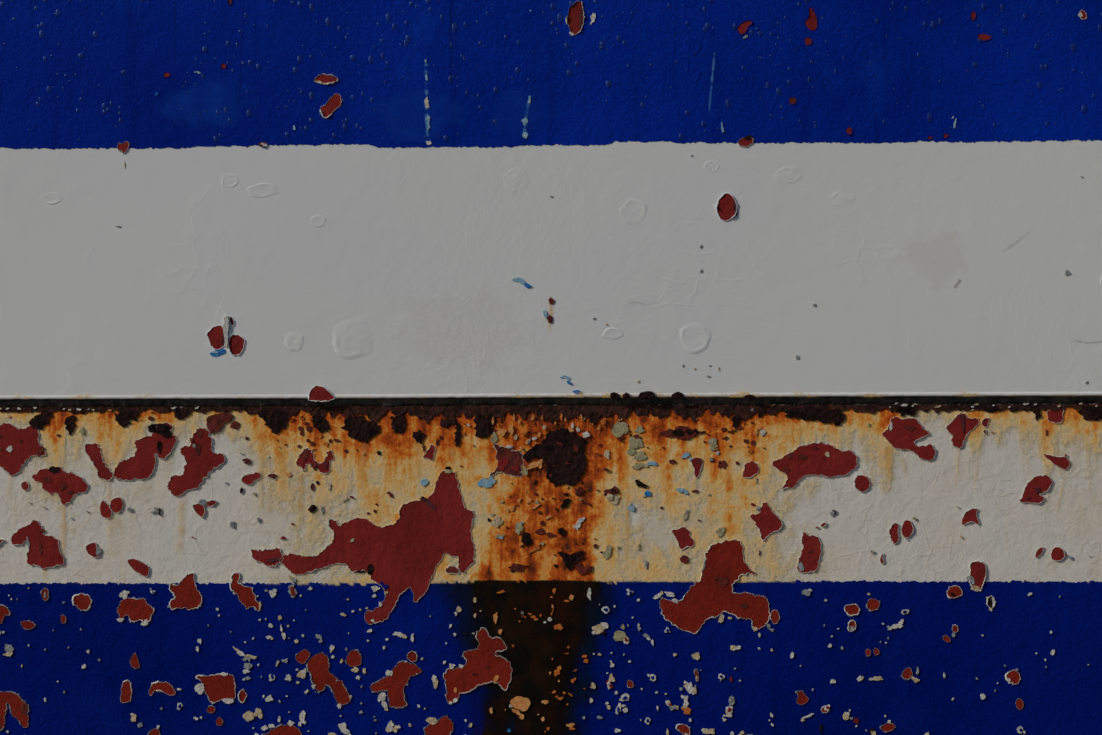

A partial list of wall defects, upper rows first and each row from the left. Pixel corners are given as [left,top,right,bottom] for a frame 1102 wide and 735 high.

peeling [716,193,738,221]
peeling [206,316,245,356]
peeling [0,406,249,519]
peeling [240,385,766,556]
peeling [772,442,871,492]
peeling [882,402,936,461]
peeling [0,520,64,569]
peeling [116,559,202,626]
peeling [149,465,753,735]
corrosion [0,391,1102,735]
peeling [653,527,780,652]
peeling [797,510,836,573]